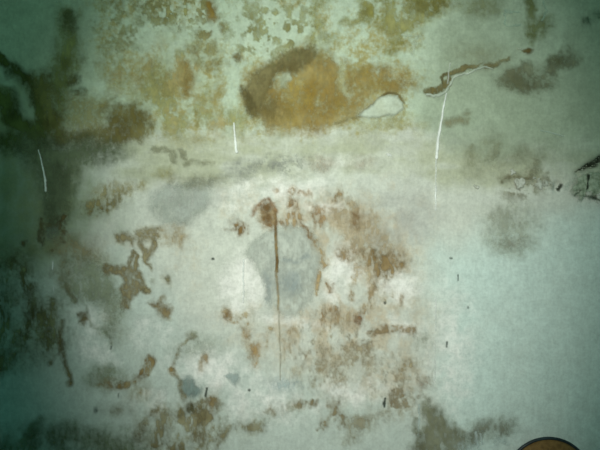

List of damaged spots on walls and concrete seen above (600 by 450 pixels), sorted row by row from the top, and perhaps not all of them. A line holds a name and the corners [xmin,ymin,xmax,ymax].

water stain [0,0,228,313]
water stain [194,0,407,131]
spalling [359,92,404,118]
crack [424,57,510,97]
water stain [500,55,578,93]
peeling [103,227,159,309]
corrosion [253,198,315,304]
water stain [0,258,72,385]